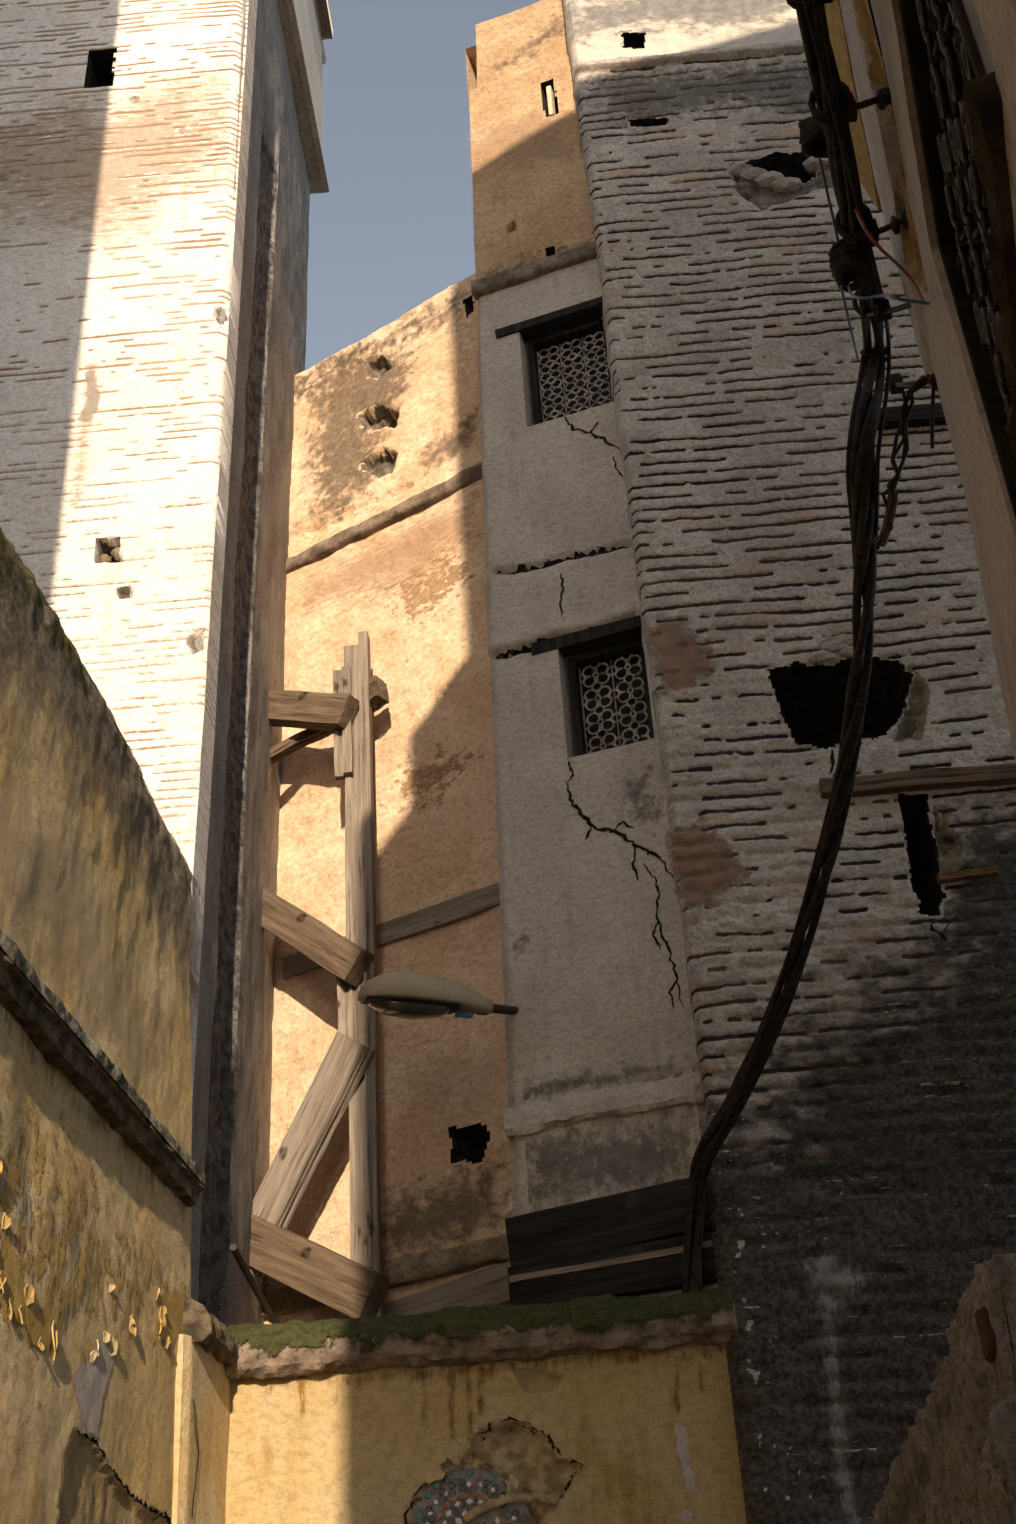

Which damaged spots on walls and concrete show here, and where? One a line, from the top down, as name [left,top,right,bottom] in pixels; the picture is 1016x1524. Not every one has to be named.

leakage [497,0,790,70]
spalling [726,156,832,211]
leakage [77,369,99,420]
crack [565,417,624,477]
leakage [0,537,200,977]
spalling [893,665,931,742]
flaking render [0,132,279,1524]
crack [565,761,683,1008]
leakage [800,1254,928,1524]
spalling [404,1416,583,1524]